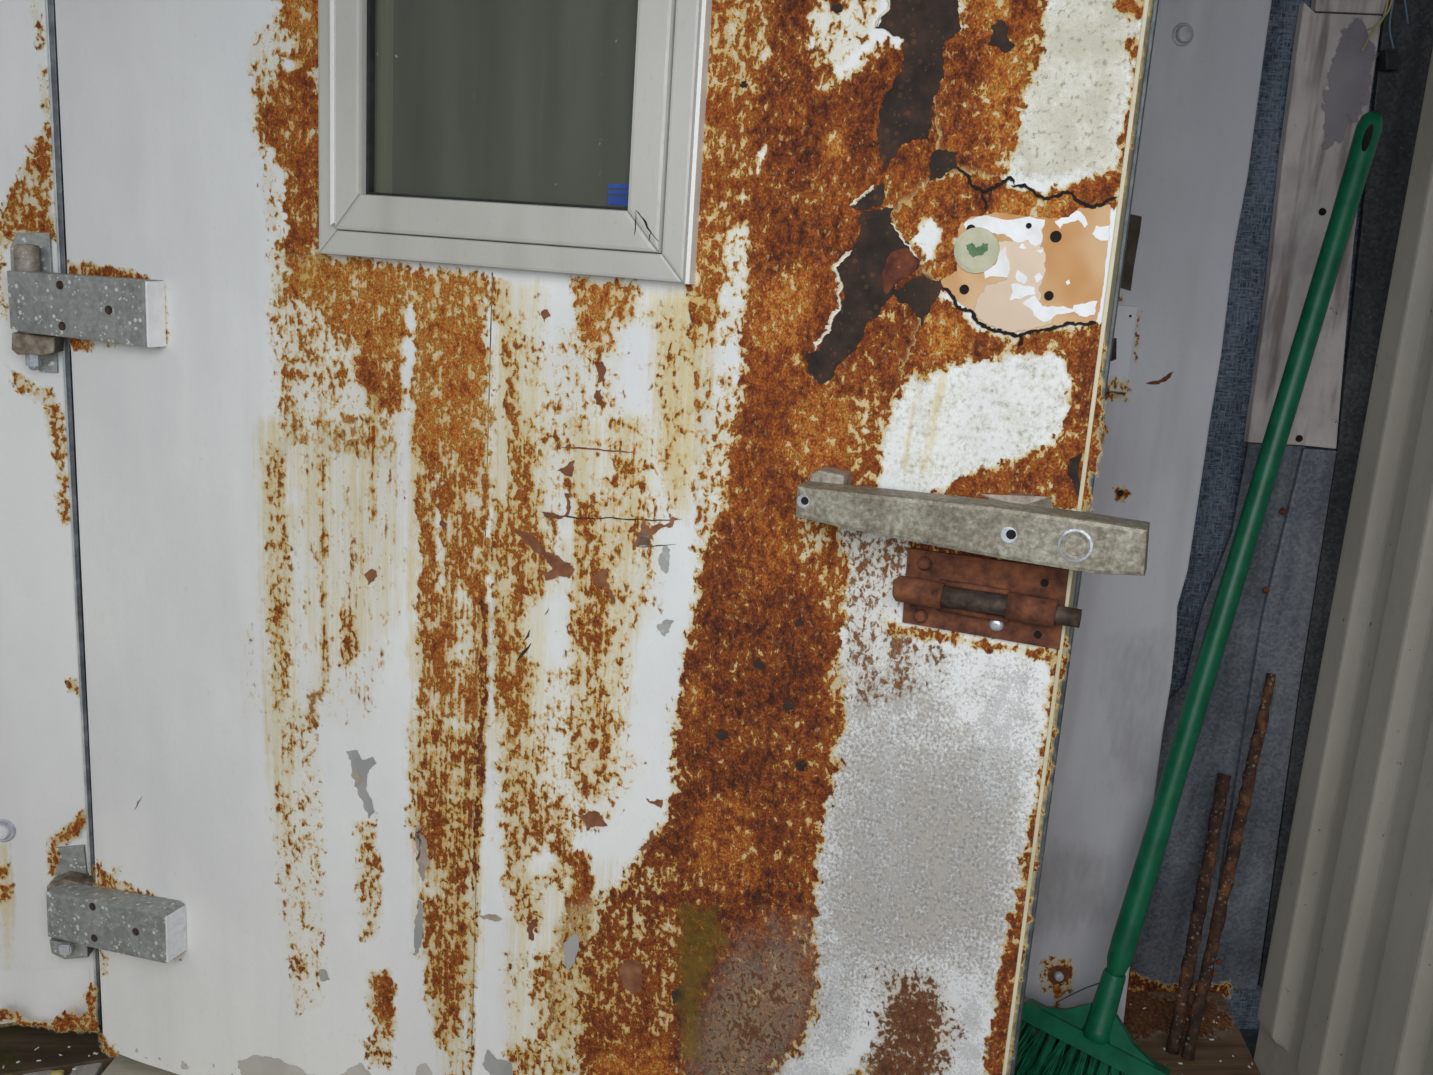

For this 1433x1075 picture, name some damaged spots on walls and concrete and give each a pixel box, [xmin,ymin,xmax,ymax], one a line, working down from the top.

crack [956,166,1117,213]
peeling [941,204,1111,333]
crack [941,287,1097,347]
corrosion [12,371,71,524]
corrosion [248,0,1150,1075]
peeling [346,750,376,818]
corrosion [92,863,154,896]
corrosion [0,950,119,1057]
corrosion [1123,969,1235,1042]
peeling [232,1055,307,1075]
peeling [341,1063,371,1075]
peeling [416,1063,432,1075]